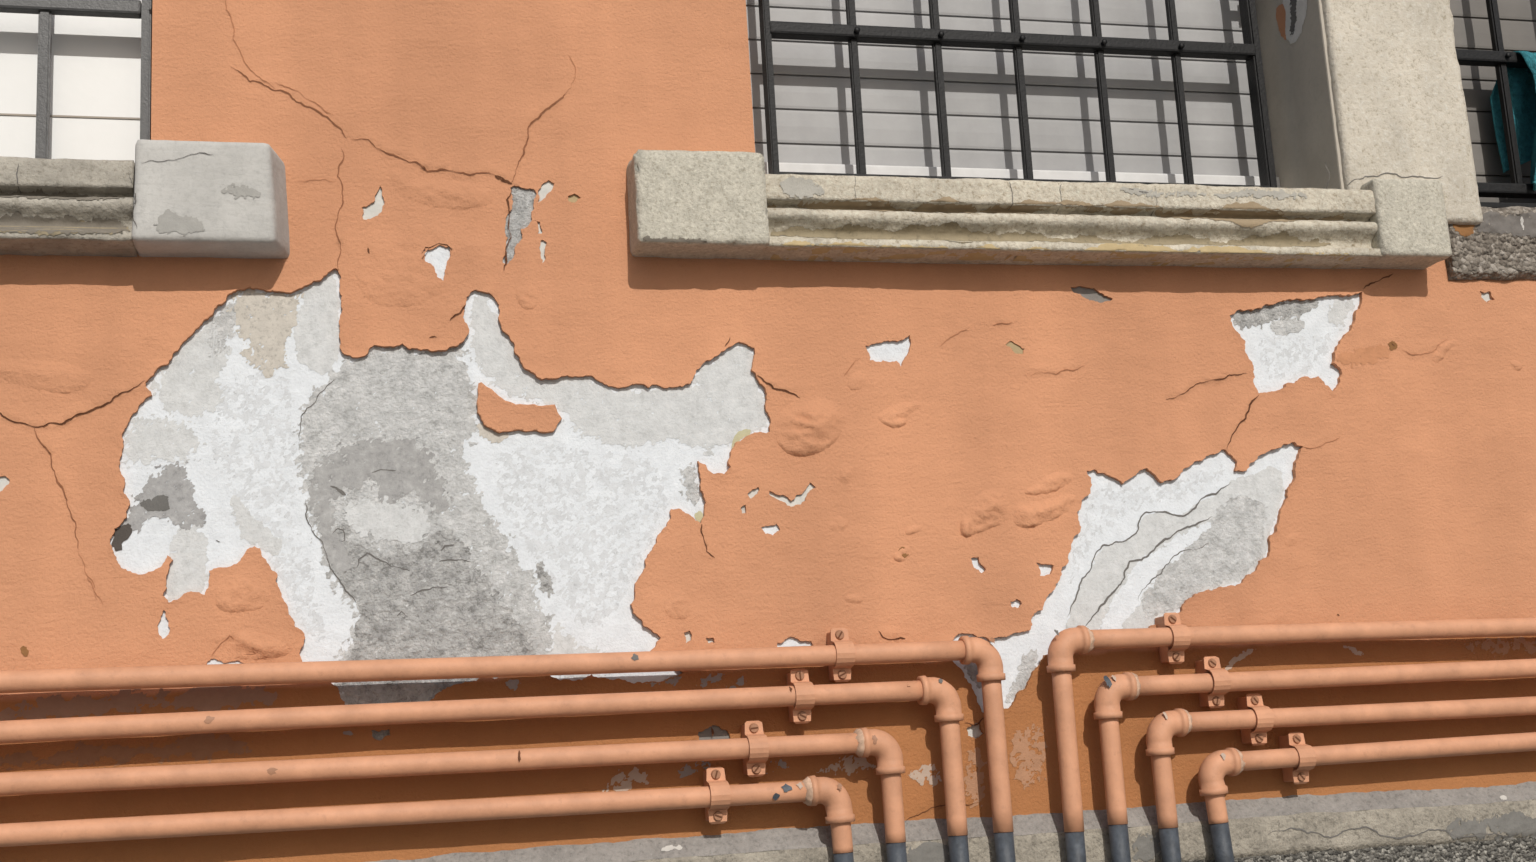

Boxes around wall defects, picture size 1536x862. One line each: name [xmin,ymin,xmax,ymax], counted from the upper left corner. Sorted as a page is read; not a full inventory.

crack [225,0,576,269]
peeling [503,181,580,264]
peeling [866,336,910,366]
peeling [1230,293,1360,393]
crack [0,381,143,604]
peeling [110,270,770,688]
crack [1067,373,1259,625]
peeling [953,443,1300,709]
peeling [332,677,521,705]
peeling [909,764,942,787]
peeling [953,661,987,808]
peeling [1009,723,1048,790]